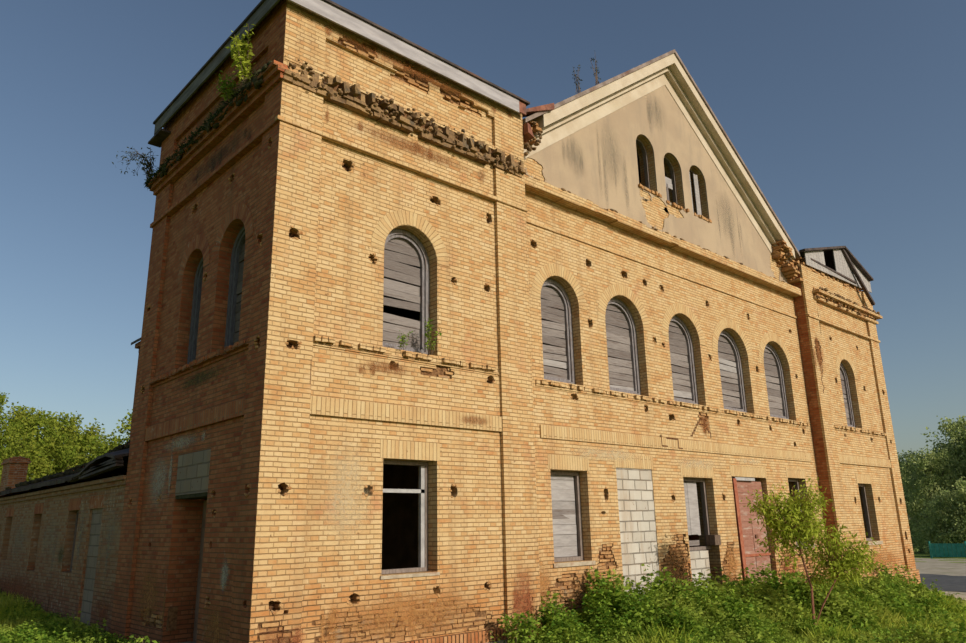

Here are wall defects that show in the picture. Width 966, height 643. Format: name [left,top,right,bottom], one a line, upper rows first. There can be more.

spalling [338,36,379,66]
spalling [300,69,547,181]
flaking render [639,189,684,231]
spalling [770,240,803,284]
spalling [420,367,453,379]
spalling [660,534,690,591]
spalling [253,600,298,643]
spalling [312,585,498,643]
spalling [511,544,618,643]